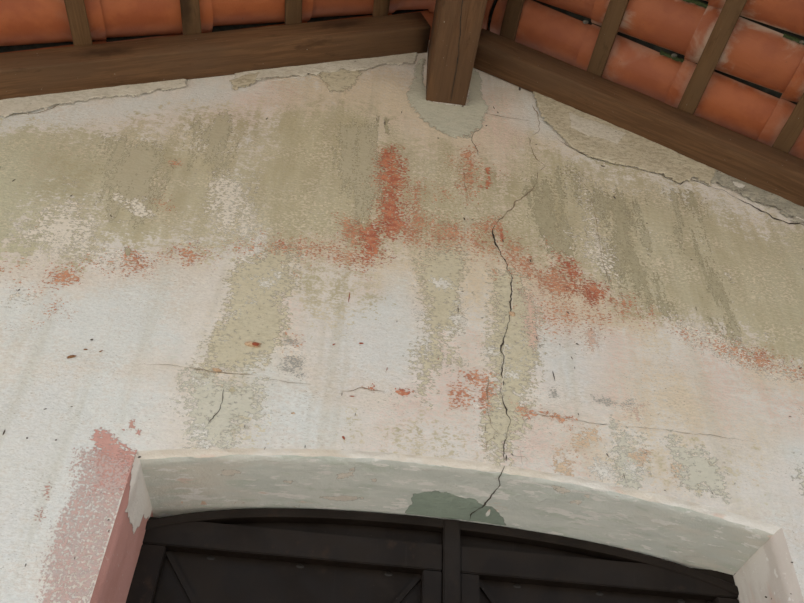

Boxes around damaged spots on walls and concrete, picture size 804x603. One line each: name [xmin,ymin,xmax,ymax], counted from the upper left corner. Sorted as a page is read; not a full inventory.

leakage [93,133,177,230]
leakage [323,115,390,226]
rust [0,143,804,381]
crack [470,105,604,518]
leakage [522,163,679,321]
leakage [658,185,742,348]
crack [662,175,803,225]
rust [446,367,603,477]
peeling [36,419,152,603]
peeling [405,491,505,525]